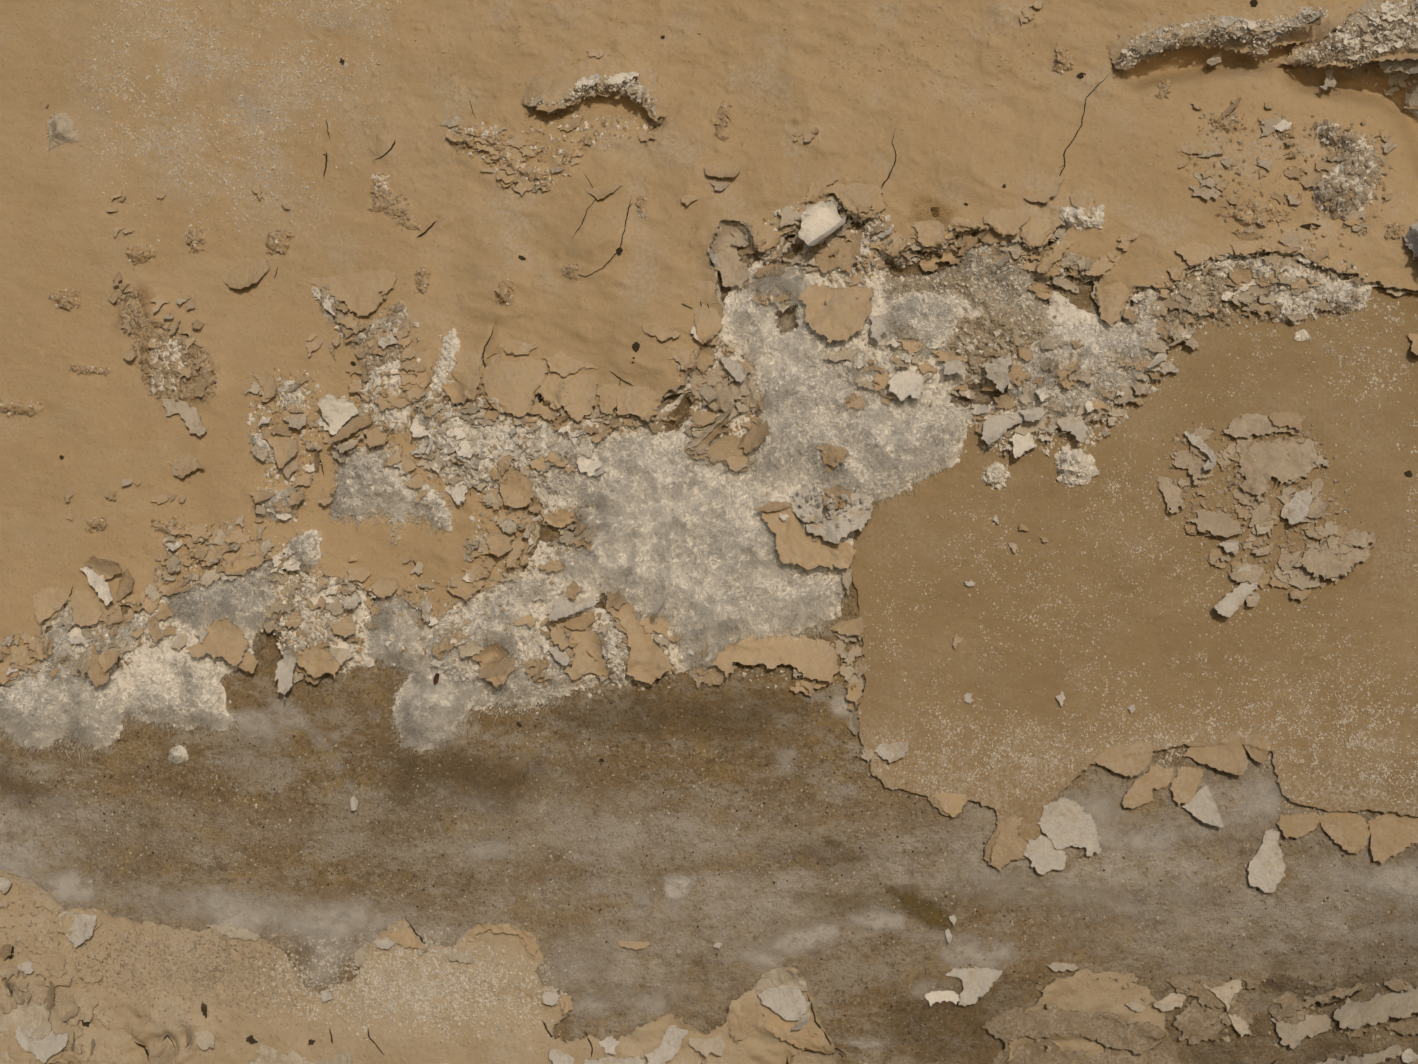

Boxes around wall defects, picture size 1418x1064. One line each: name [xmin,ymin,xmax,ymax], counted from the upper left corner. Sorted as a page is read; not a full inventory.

leakage [1118,0,1418,68]
leakage [1221,195,1285,228]
leakage [1276,121,1296,141]
leakage [1311,119,1388,220]
peeling [0,269,909,763]
leakage [0,215,1372,808]
peeling [1156,411,1376,617]
peeling [1094,733,1269,827]
peeling [988,797,1102,875]
peeling [1247,810,1418,893]
leakage [743,891,947,964]
peeling [982,966,1418,1064]